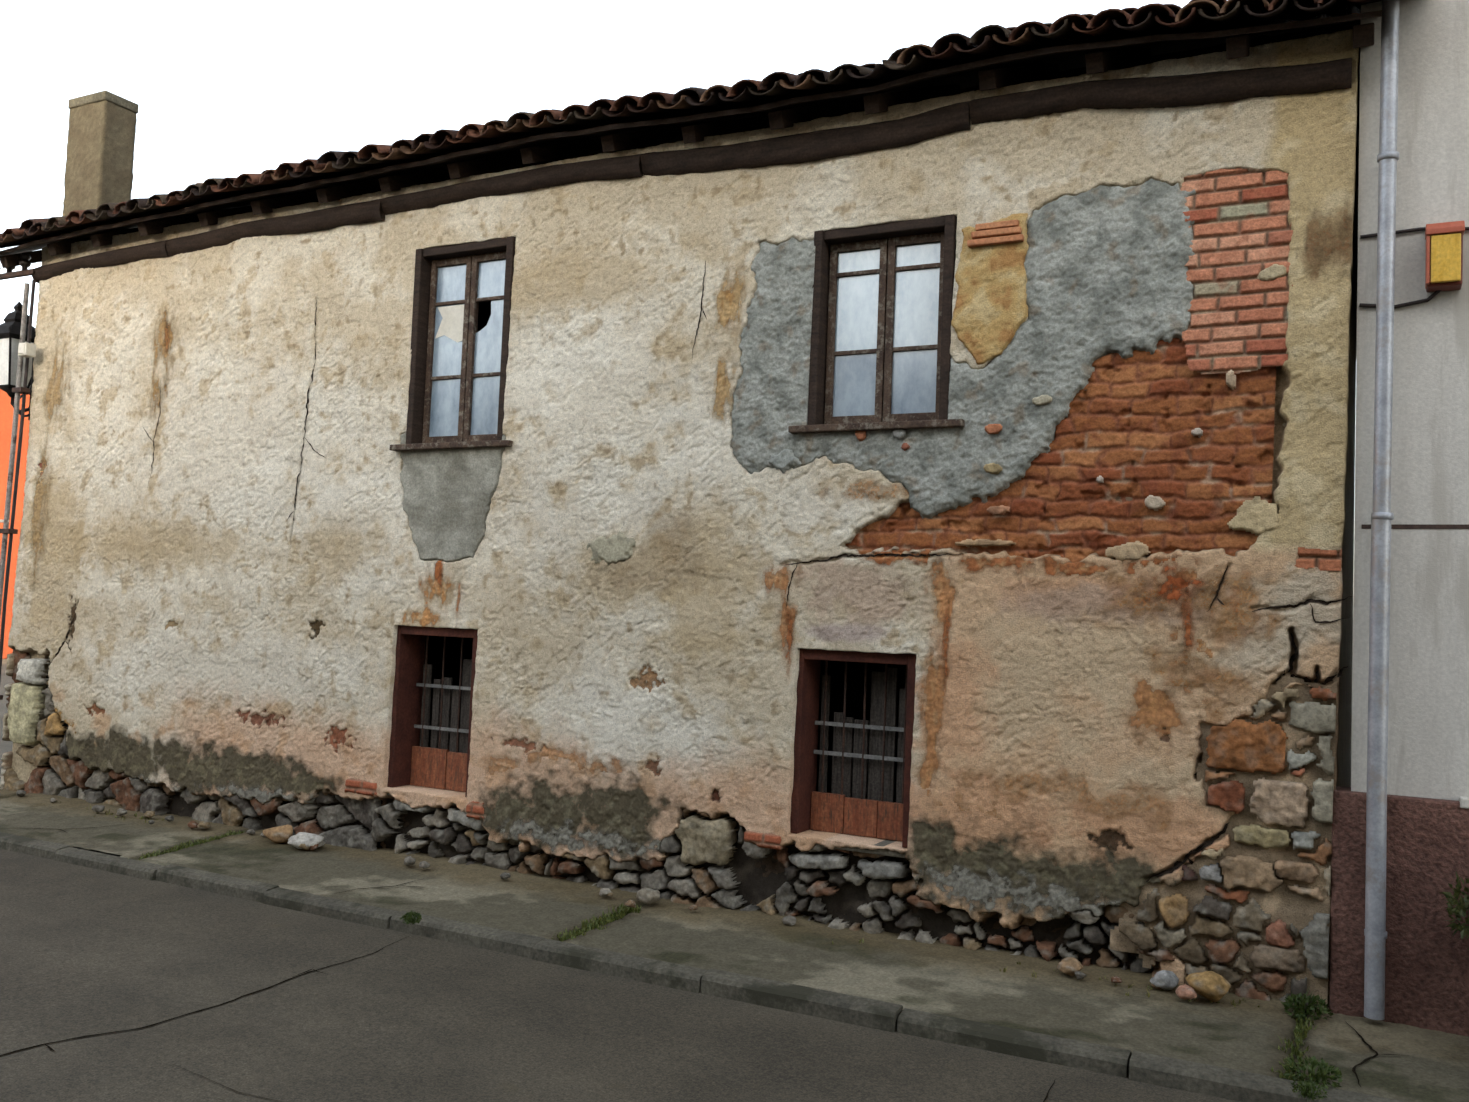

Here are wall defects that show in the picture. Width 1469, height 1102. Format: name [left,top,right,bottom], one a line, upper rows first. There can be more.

flaking render [846,168,1293,563]
flaking render [1295,547,1342,571]
rust [764,565,797,663]
rust [866,549,1276,830]
damp [480,770,687,860]